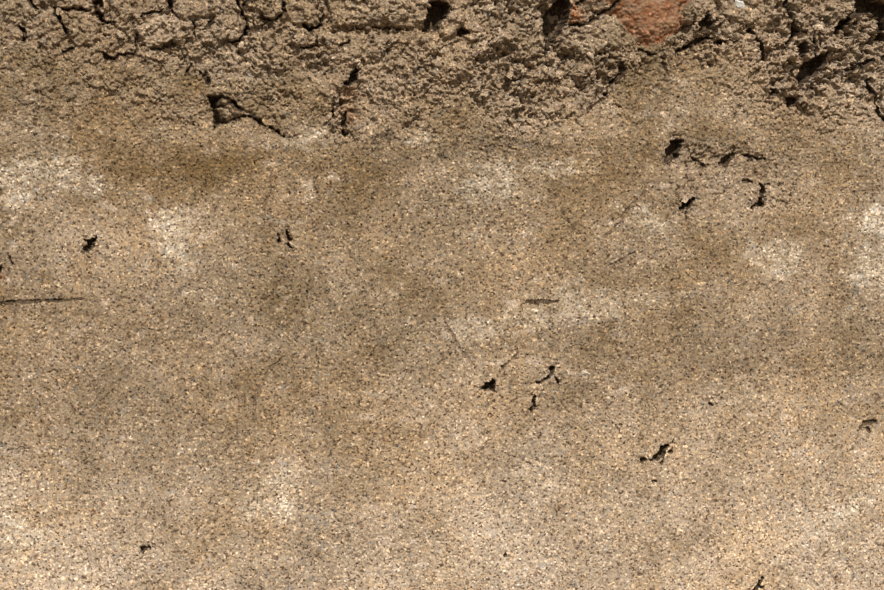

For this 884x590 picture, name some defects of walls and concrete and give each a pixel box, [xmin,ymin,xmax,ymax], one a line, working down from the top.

spalling [0,0,884,145]
crack [568,0,621,28]
crack [602,0,819,96]
crack [844,61,884,123]